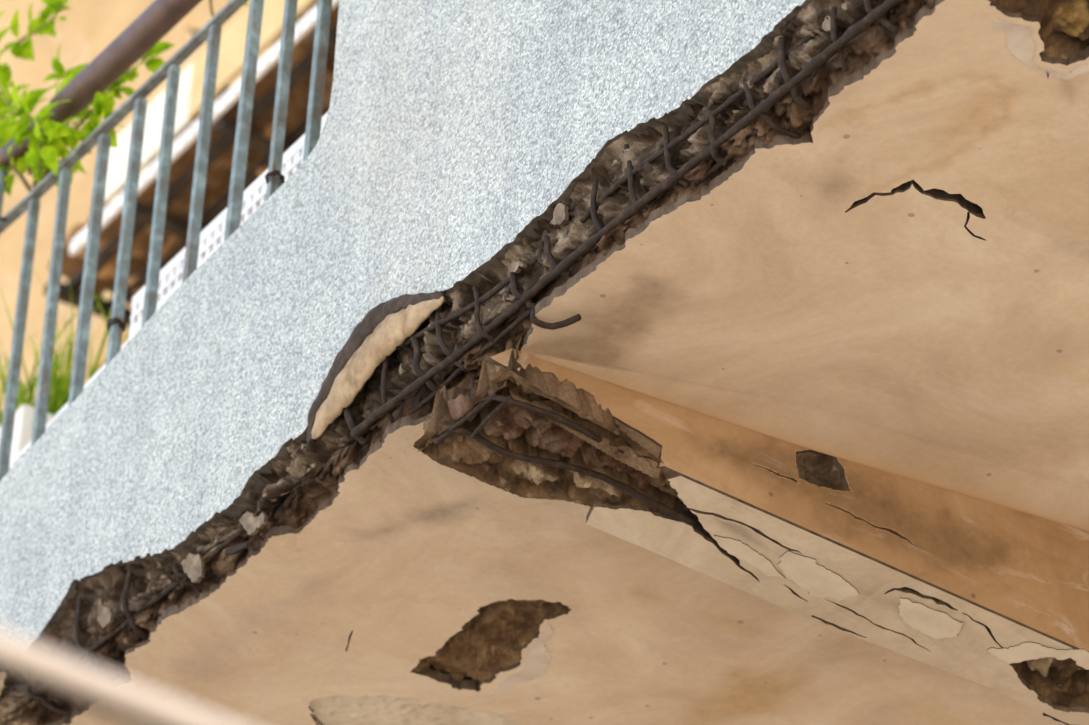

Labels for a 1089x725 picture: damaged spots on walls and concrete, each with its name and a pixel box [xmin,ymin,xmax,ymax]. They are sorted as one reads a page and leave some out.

spalling [990,0,1089,80]
crack [853,180,984,224]
spalling [38,0,936,678]
crack [677,501,740,563]
crack [900,587,942,602]
peeling [898,597,963,639]
spalling [412,599,568,696]
spalling [0,673,85,725]
peeling [309,695,517,725]
spalling [987,642,1089,708]
crack [1043,713,1069,725]